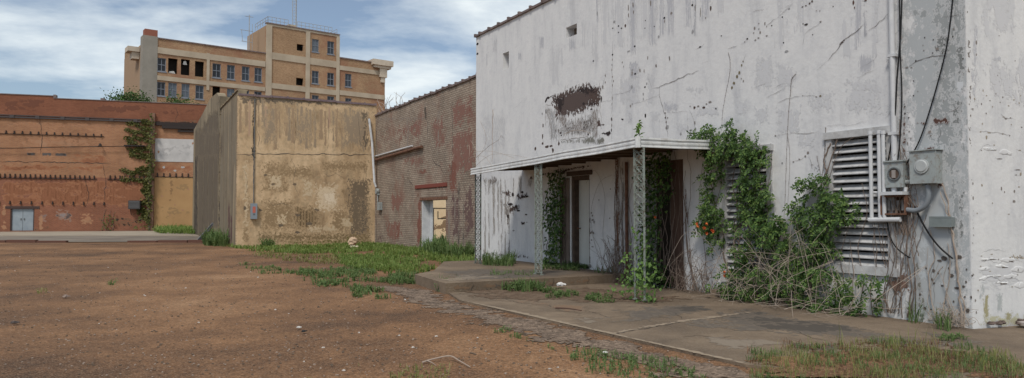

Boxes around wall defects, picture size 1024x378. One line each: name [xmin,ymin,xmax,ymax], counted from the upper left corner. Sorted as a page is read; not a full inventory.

water stain [156,96,423,245]
peeling [397,87,528,245]
spalling [545,56,657,136]
crack [545,44,709,141]
water stain [431,0,1024,363]
peeling [886,237,1001,315]